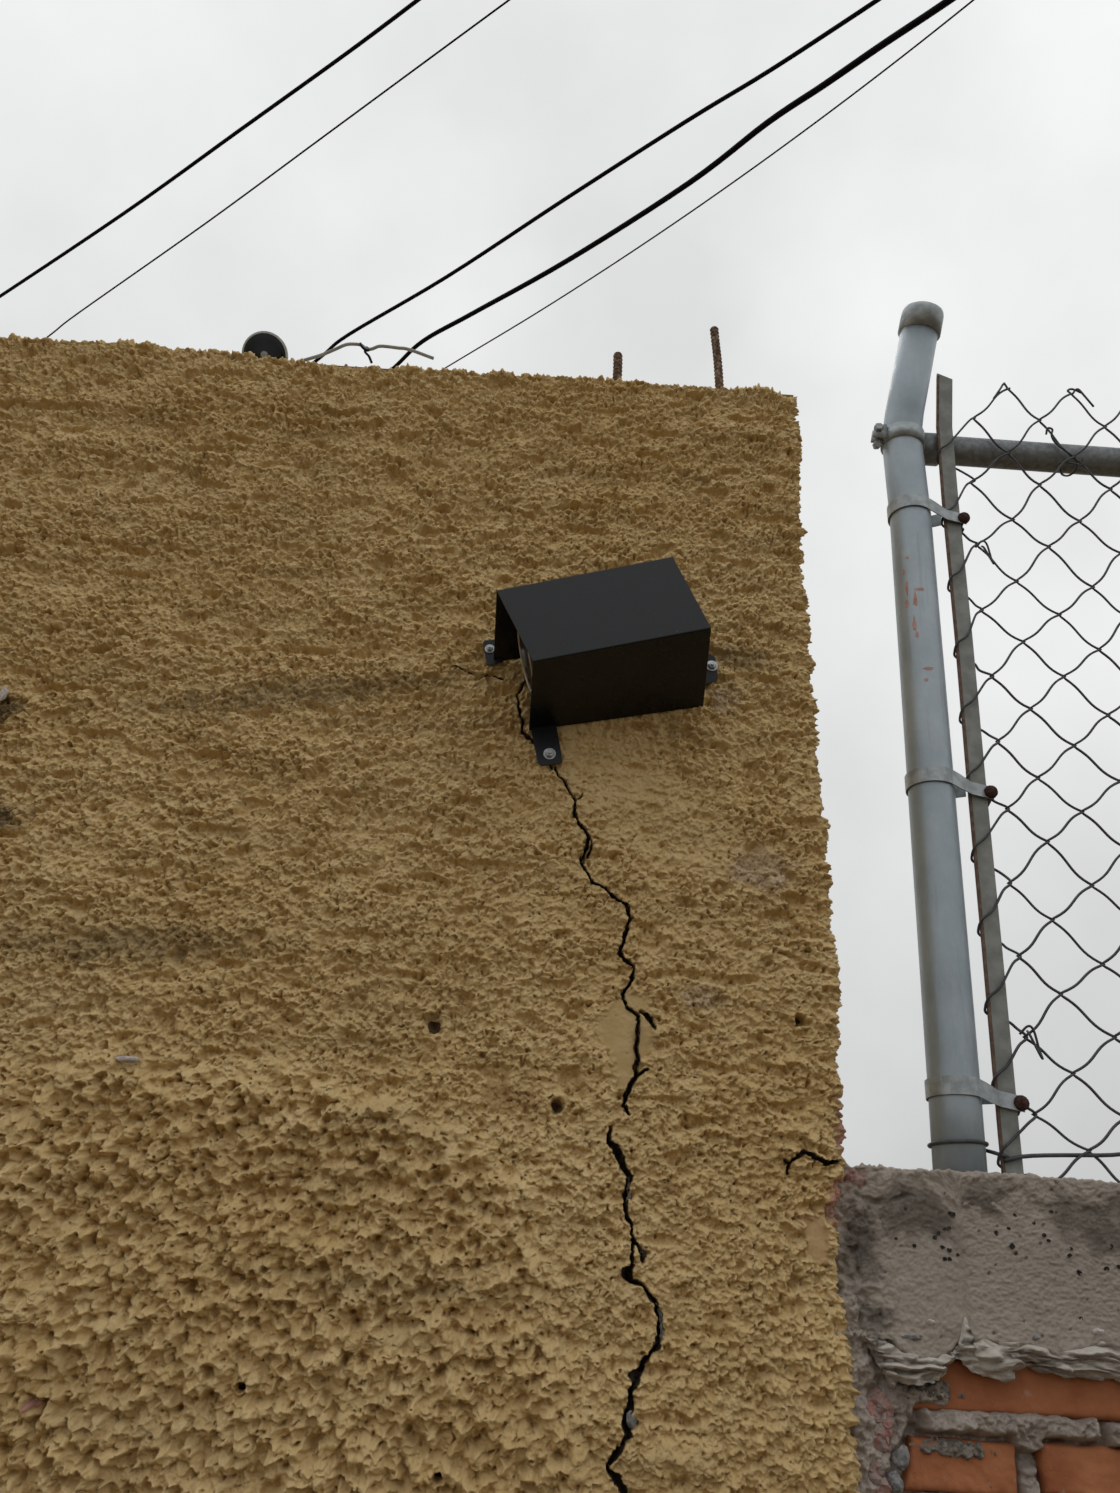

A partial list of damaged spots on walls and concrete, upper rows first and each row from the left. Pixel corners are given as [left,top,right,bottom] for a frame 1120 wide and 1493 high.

crack [451,665,665,1493]
crack [783,1151,839,1175]